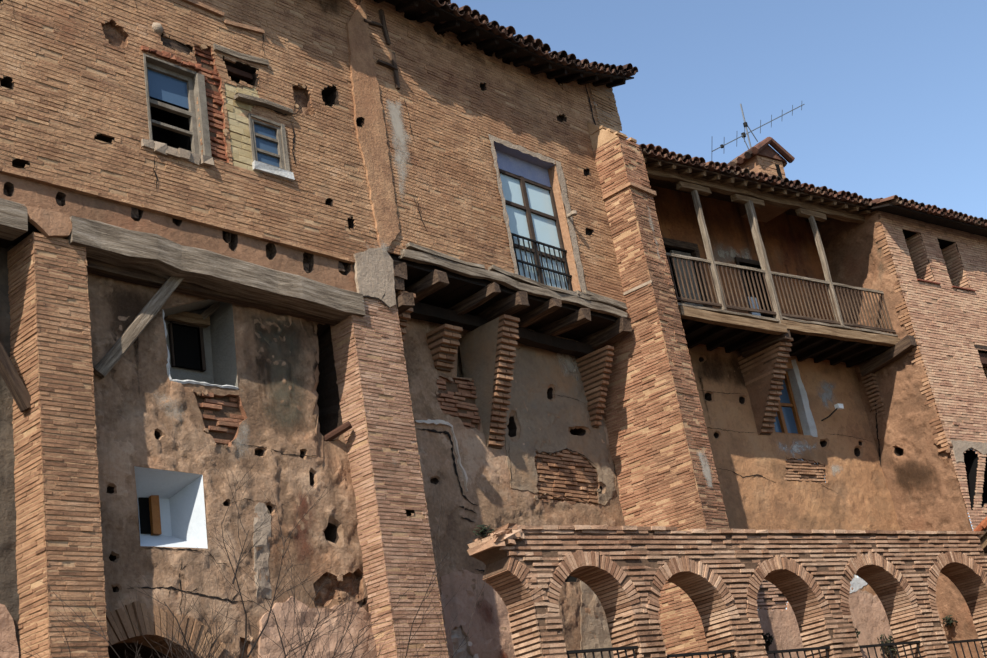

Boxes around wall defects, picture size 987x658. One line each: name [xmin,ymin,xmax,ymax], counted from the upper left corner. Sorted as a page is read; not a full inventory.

flaking render [161,33,259,163]
flaking render [192,389,247,448]
spalling [568,426,591,437]
flaking render [534,449,606,506]
flaking render [784,456,828,484]
leakage [895,462,937,490]
flaking render [313,568,368,608]